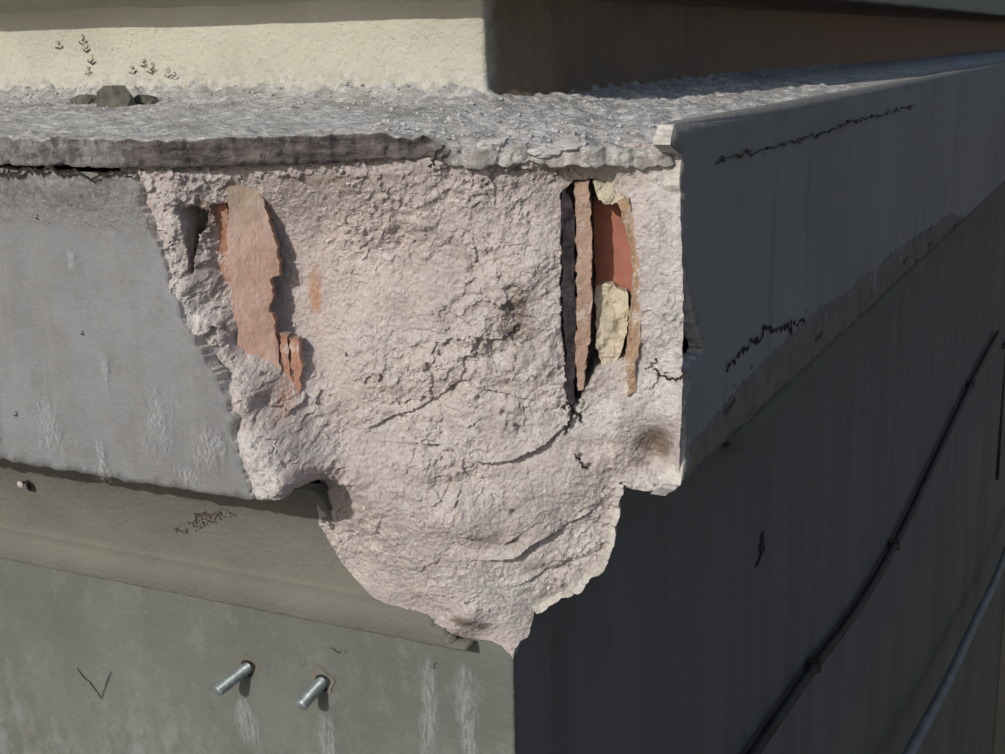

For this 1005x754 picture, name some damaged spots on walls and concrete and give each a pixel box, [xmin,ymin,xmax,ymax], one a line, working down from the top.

spalling [120,156,965,658]